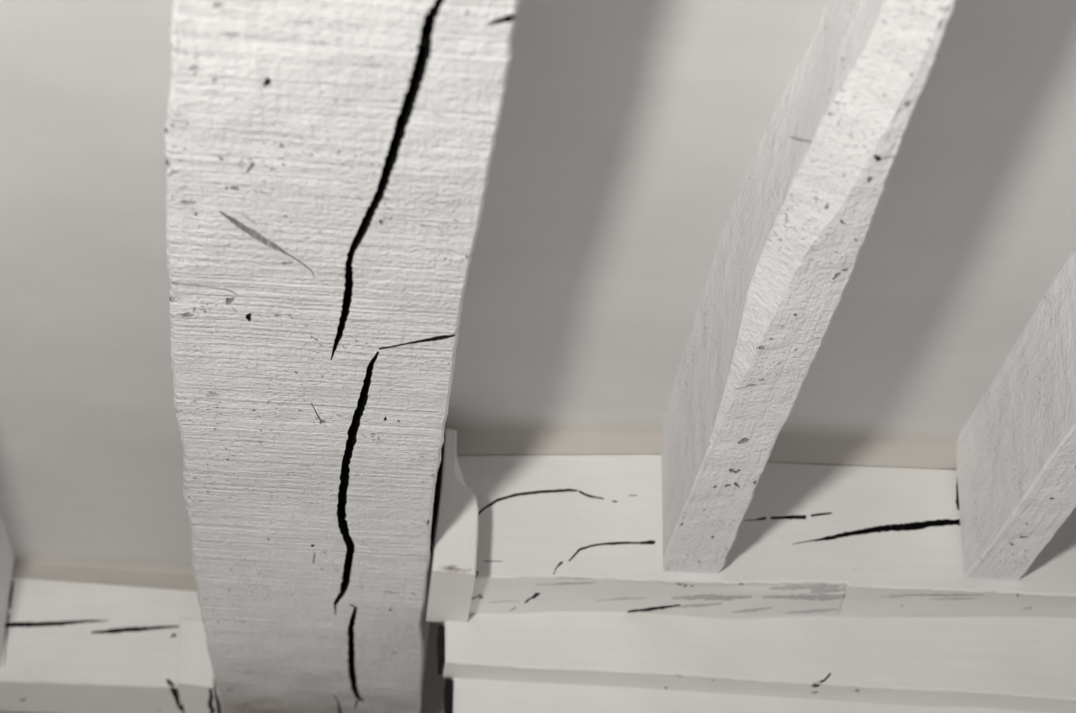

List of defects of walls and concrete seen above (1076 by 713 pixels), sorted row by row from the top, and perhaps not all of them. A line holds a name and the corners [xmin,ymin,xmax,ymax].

crack [330,0,495,360]
crack [478,488,637,515]
crack [311,333,456,713]
crack [745,512,960,544]
crack [553,540,655,575]
crack [5,620,179,634]